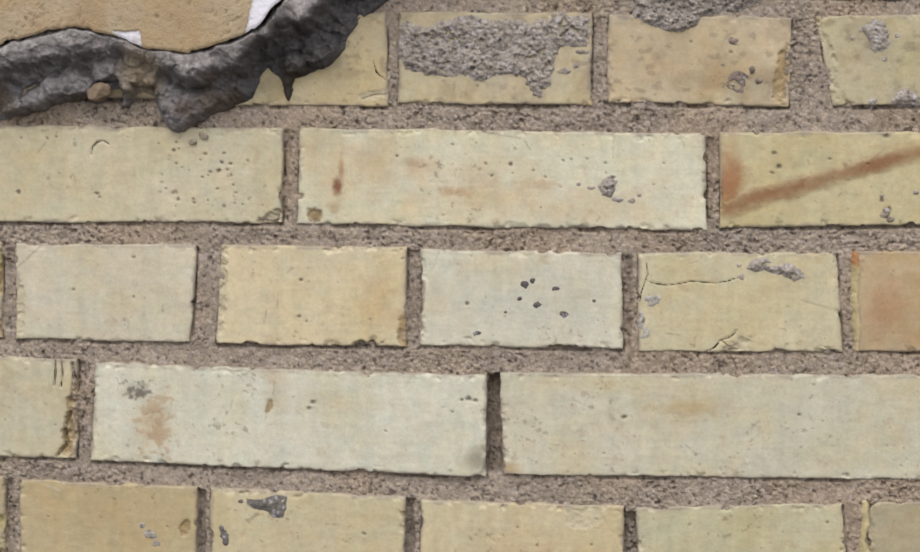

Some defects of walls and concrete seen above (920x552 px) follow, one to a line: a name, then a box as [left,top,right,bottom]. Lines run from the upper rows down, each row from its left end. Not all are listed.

flaking render [0,0,388,145]
peeling [557,49,589,75]
rust [721,141,920,222]